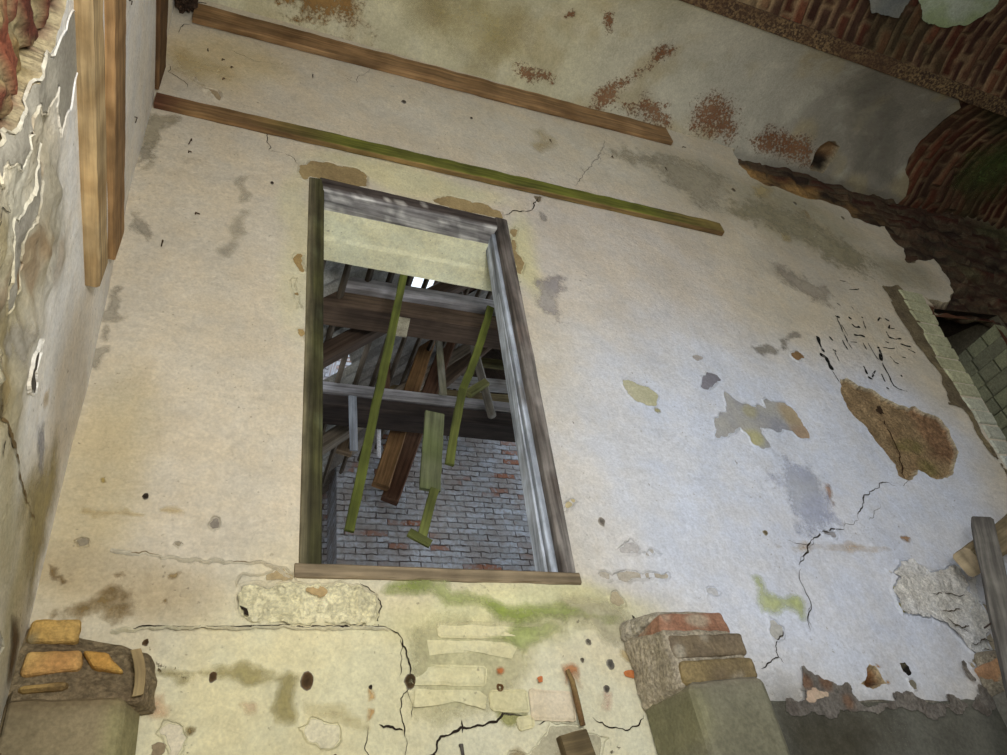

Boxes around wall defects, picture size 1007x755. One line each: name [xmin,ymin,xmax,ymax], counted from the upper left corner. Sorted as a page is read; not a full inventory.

spalling [0,0,78,316]
spalling [733,100,1007,328]
peeling [688,353,812,451]
spalling [840,378,959,481]
crack [111,584,413,755]
spalling [234,566,381,630]
water stain [569,603,624,640]
crack [761,627,784,669]
crack [793,480,909,625]
spalling [786,557,996,720]
crack [431,712,545,755]
crack [597,716,644,731]